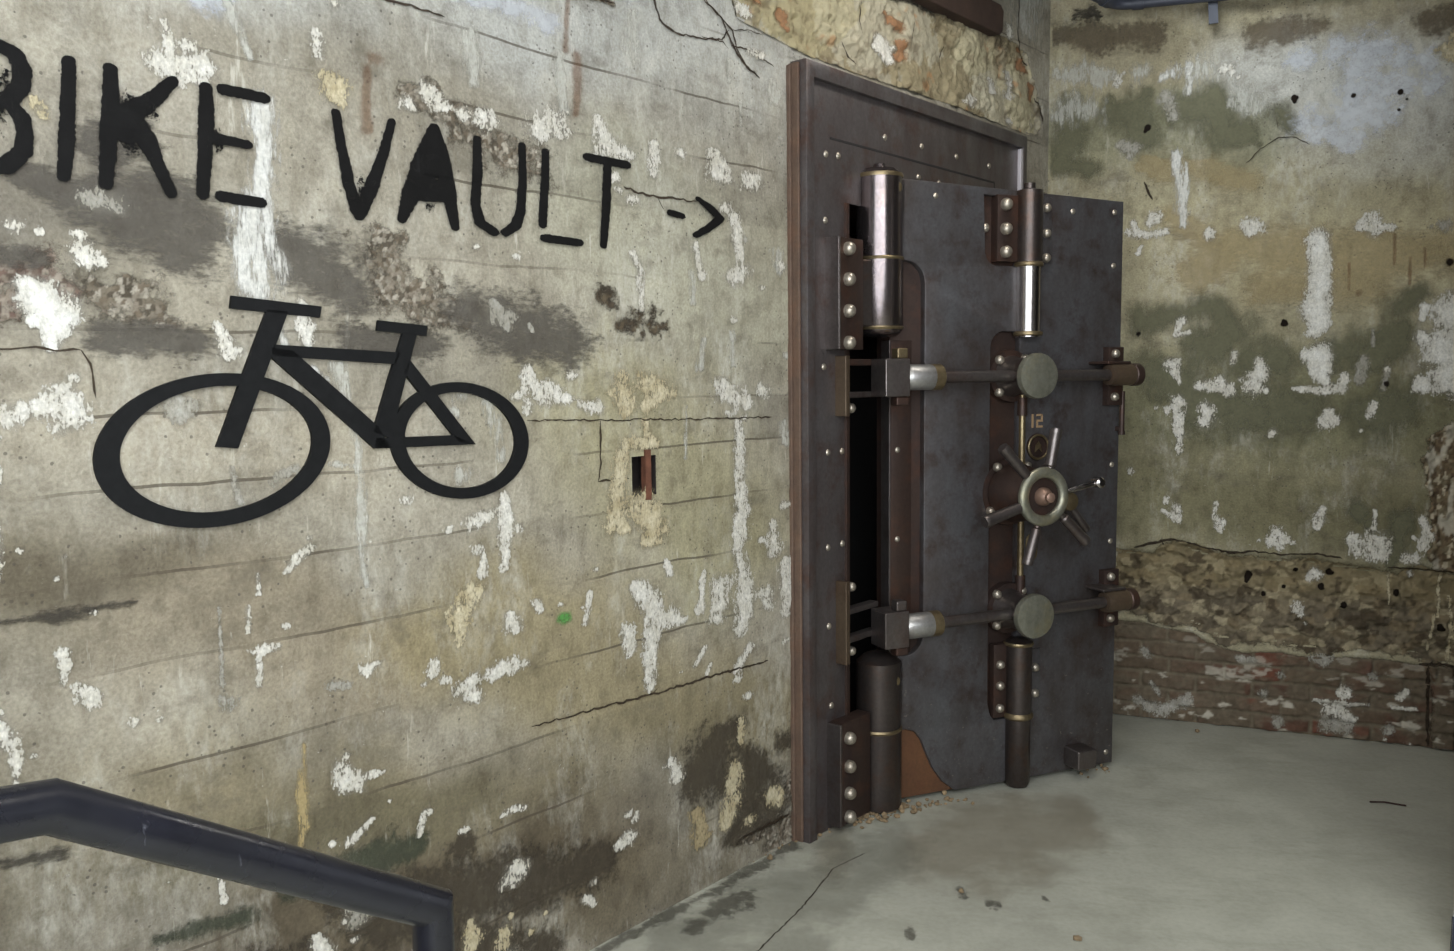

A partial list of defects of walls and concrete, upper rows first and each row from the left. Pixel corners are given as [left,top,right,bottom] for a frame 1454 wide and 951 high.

crack [385,0,444,17]
crack [654,0,774,78]
flaking render [732,0,1041,136]
peeling [1291,227,1392,433]
peeling [1410,289,1454,403]
peeling [1154,351,1270,456]
peeling [509,363,793,852]
spalling [1113,422,1454,750]
peeling [500,803,527,819]
damp [679,717,793,848]
peeling [498,858,531,893]
crack [758,853,865,951]